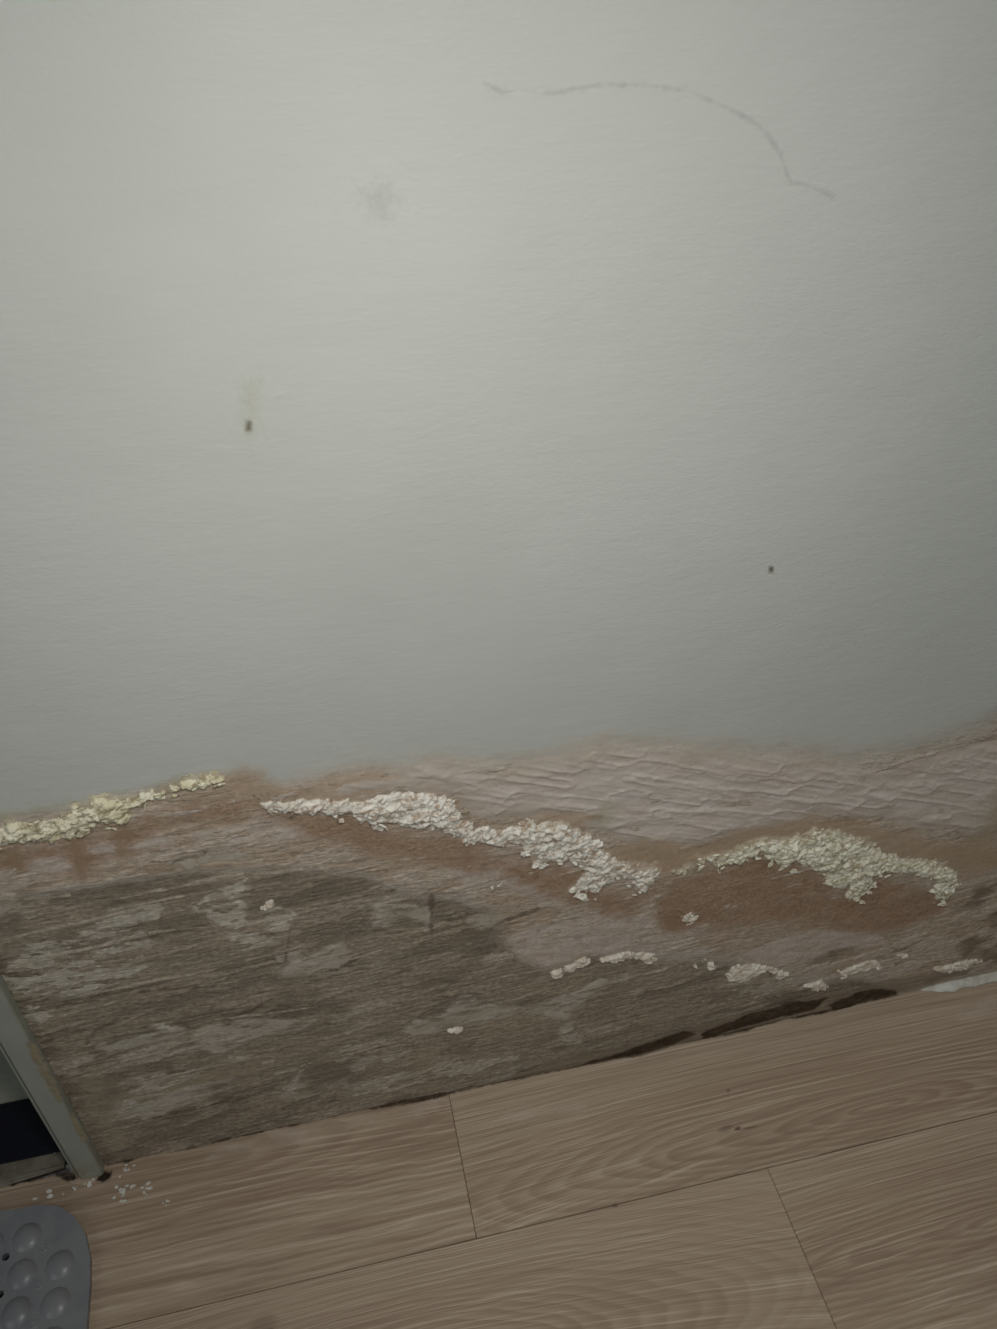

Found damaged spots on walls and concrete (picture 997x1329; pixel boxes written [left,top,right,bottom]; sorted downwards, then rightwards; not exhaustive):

flaking render [739,719,997,781]
leakage [0,770,997,1112]
flaking render [0,755,997,1165]